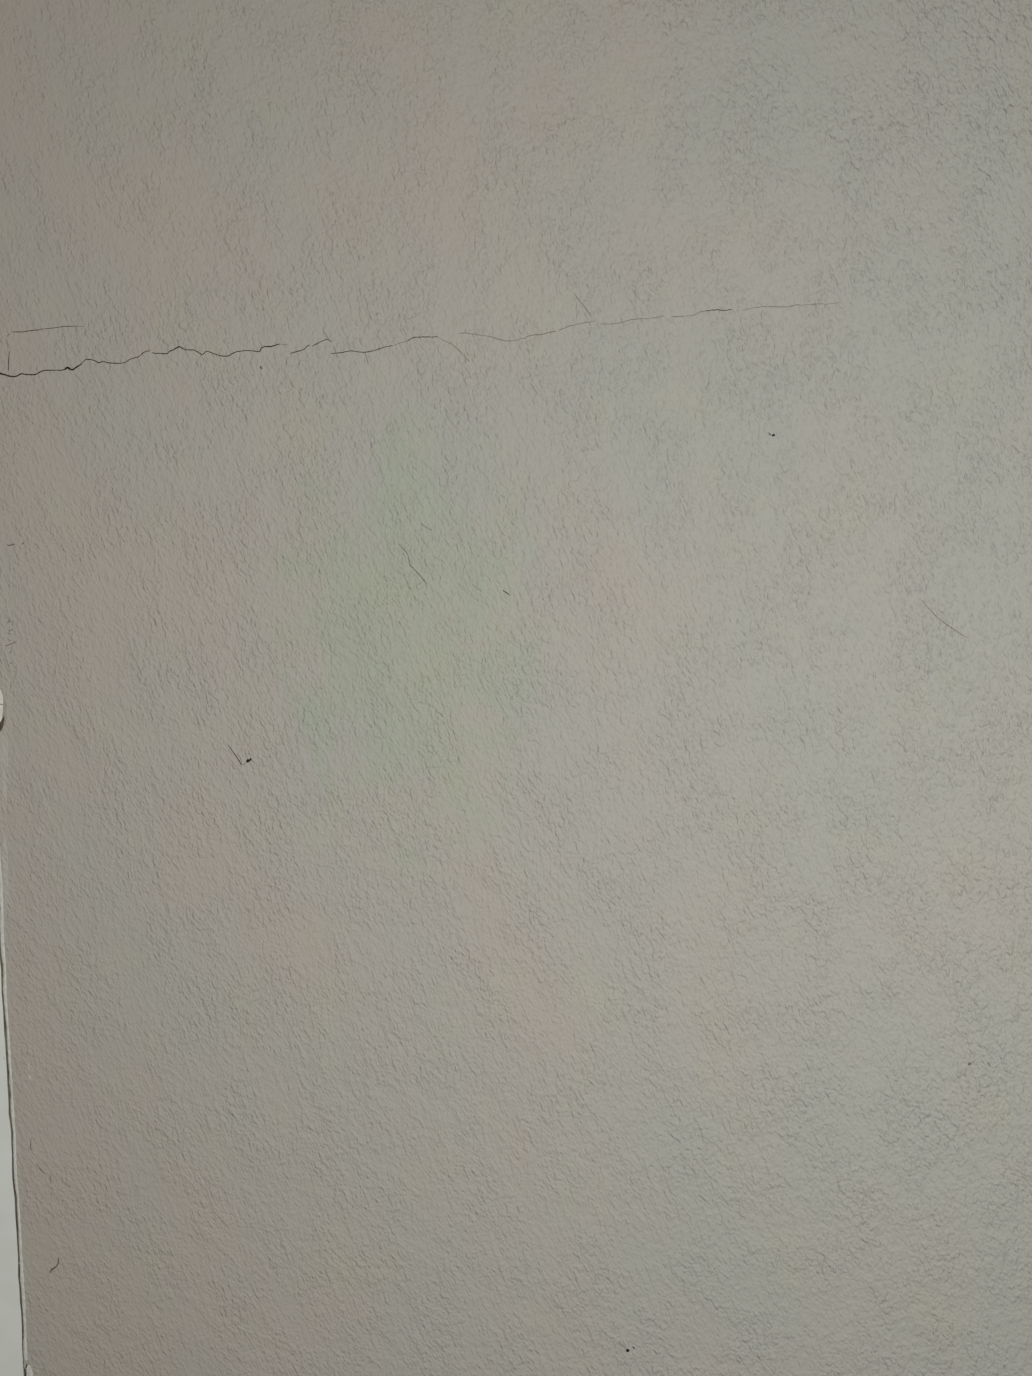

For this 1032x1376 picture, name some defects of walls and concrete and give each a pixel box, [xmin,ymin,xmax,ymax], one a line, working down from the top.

crack [0,293,839,384]
crack [0,941,13,1131]